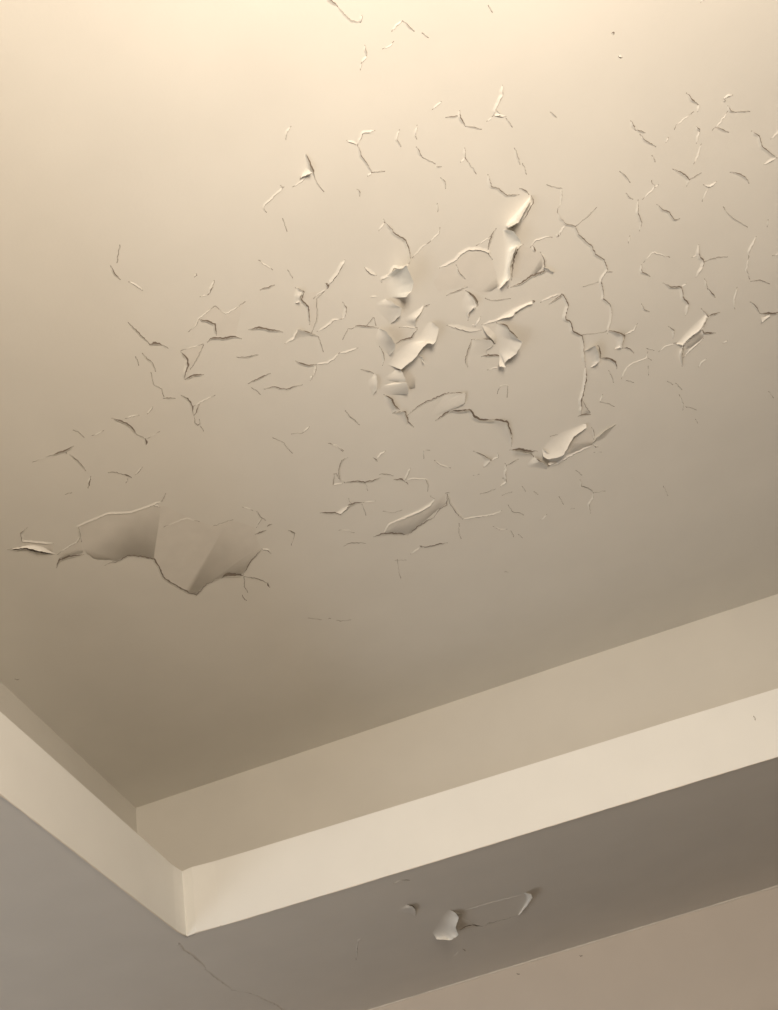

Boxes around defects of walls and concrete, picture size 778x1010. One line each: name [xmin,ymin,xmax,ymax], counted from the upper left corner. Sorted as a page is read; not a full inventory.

crack [327,0,367,70]
crack [346,101,612,334]
crack [619,93,778,323]
crack [111,245,143,291]
crack [258,260,293,290]
crack [249,325,282,333]
peeling [285,196,638,469]
peeling [660,308,720,366]
crack [33,322,215,495]
crack [238,355,313,395]
crack [328,443,602,578]
peeling [432,893,533,940]